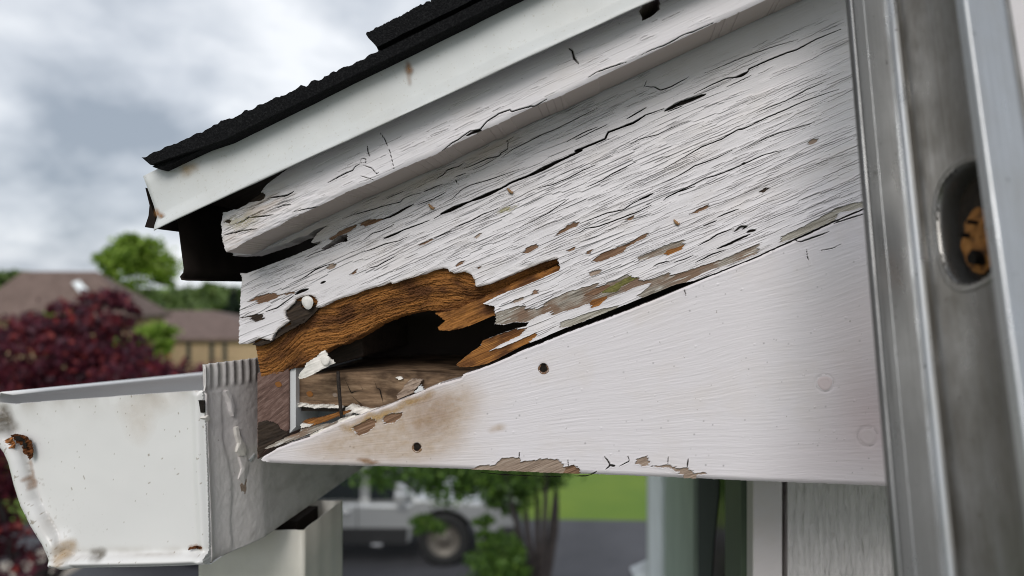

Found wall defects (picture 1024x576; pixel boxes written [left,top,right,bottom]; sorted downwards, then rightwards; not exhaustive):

crack [328,23,841,268]
crack [269,246,334,311]
peeling [240,292,295,322]
peeling [456,233,760,367]
peeling [298,350,335,379]
peeling [352,412,403,436]
corrosion [5,434,34,460]
peeling [473,457,581,474]
peeling [635,456,706,479]